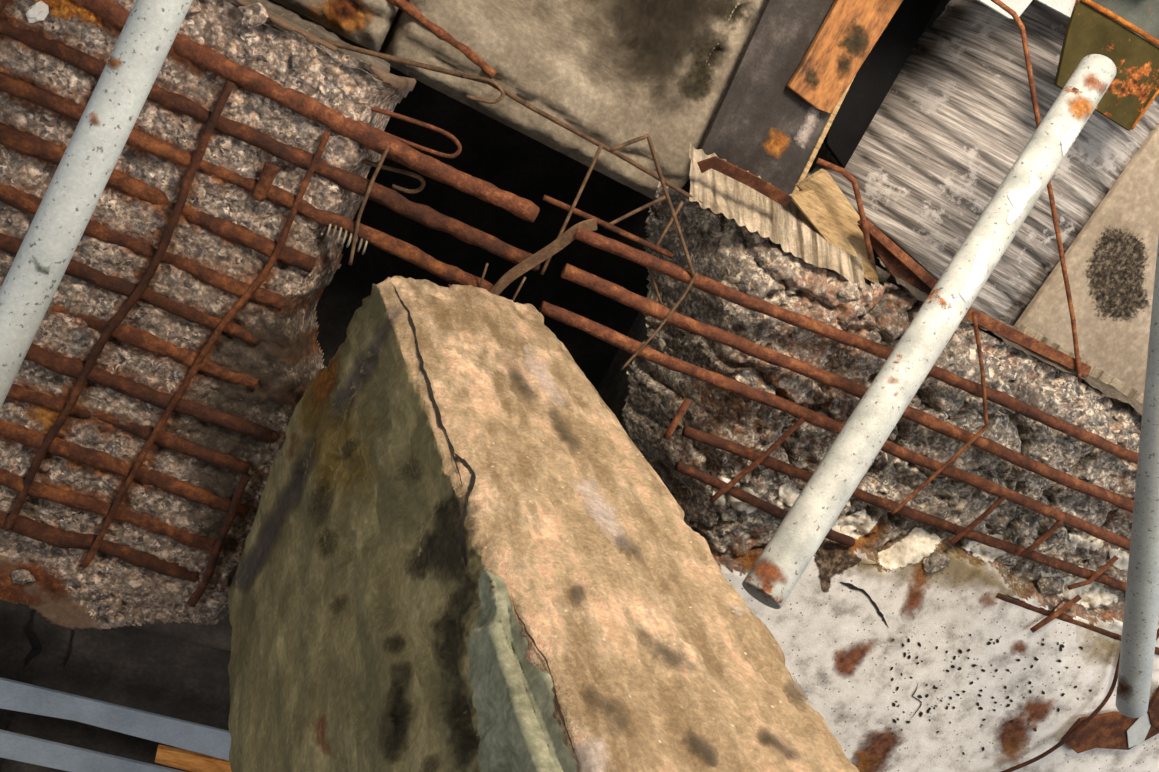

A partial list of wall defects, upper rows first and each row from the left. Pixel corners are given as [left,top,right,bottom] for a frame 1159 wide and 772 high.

rust [35,0,122,34]
leakage [596,0,749,99]
peeling [1007,172,1042,224]
spalling [0,0,541,629]
spalling [1095,233,1141,317]
spalling [539,182,924,576]
crack [394,286,476,567]
spalling [814,246,1142,641]
rust [902,547,1011,615]
rust [835,641,873,676]
rust [854,728,900,772]
rust [997,701,1052,761]